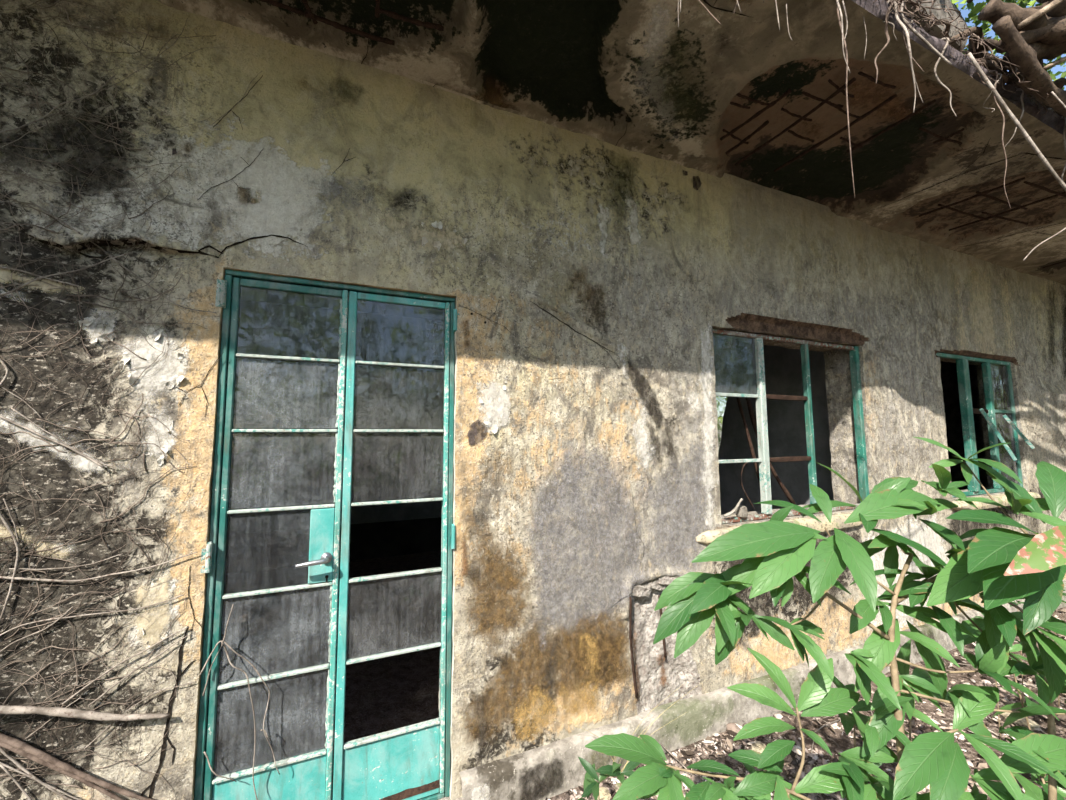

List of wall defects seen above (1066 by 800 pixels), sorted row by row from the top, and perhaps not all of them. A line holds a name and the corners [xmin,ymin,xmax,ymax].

spalling [470,0,633,131]
water stain [0,104,131,207]
crack [12,216,306,258]
water stain [599,155,641,255]
water stain [620,331,715,566]
crack [141,567,206,798]
water stain [466,452,644,762]
flaking render [628,576,702,714]